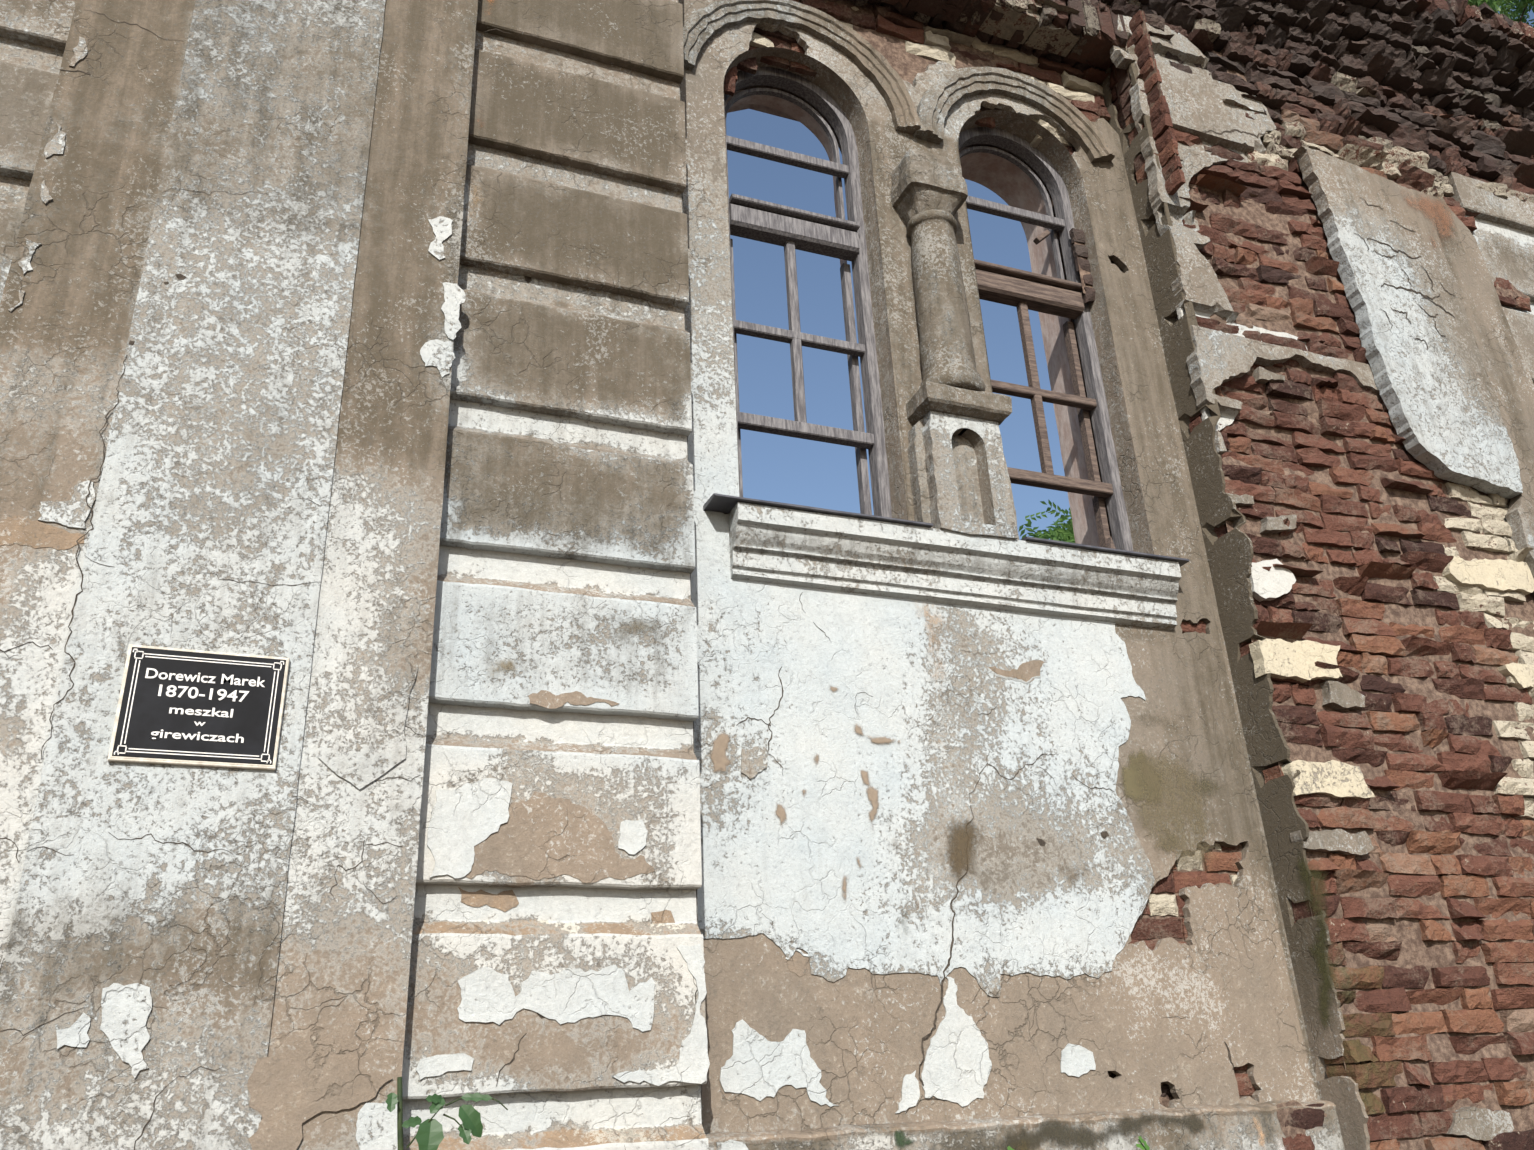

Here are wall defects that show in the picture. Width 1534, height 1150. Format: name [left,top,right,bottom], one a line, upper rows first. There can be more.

crack [0,355,127,760]
flaking render [1127,10,1534,1150]
crack [110,833,231,853]
crack [330,840,403,904]
peeling [427,778,655,912]
leakage [948,822,977,876]
leakage [1122,752,1216,858]
crack [134,1066,220,1150]
peeling [457,965,655,1032]
peeling [612,944,839,1107]
crack [905,867,969,1114]
peeling [896,977,992,1113]